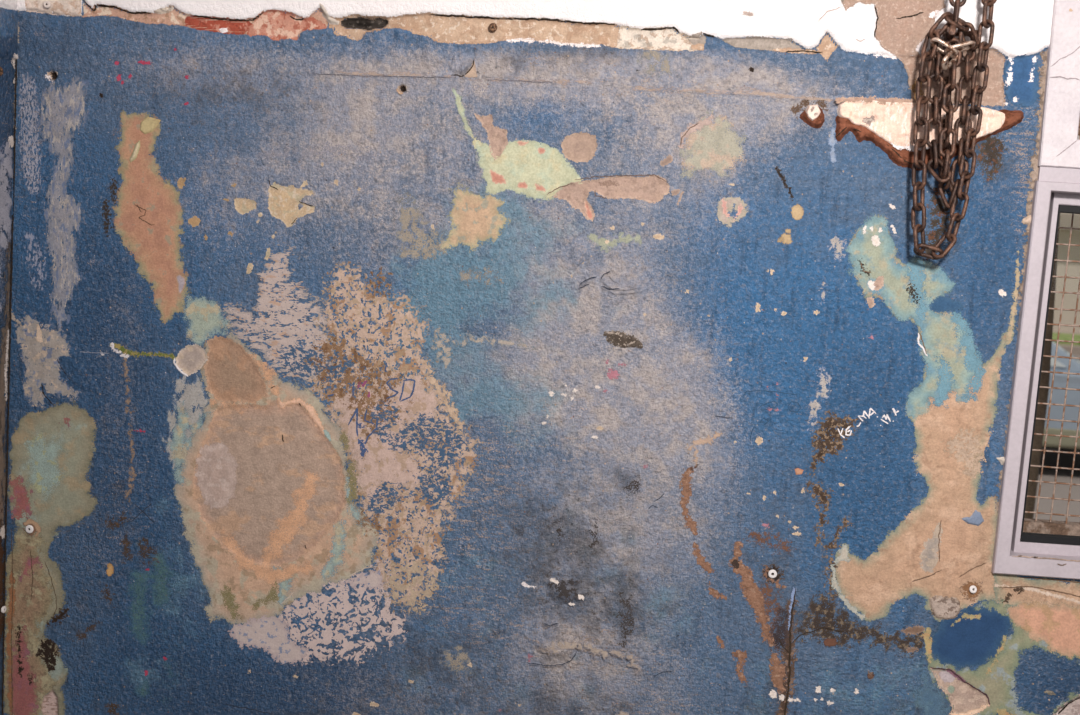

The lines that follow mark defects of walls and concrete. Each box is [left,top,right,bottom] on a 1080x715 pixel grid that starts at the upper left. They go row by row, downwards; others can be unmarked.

peeling [0,72,99,408]
peeling [100,109,379,626]
spalling [25,0,839,253]
spalling [603,330,643,349]
peeling [791,0,1080,622]
rust [679,430,797,658]
peeling [41,690,59,715]
rust [716,635,749,687]
spalling [930,667,990,715]
spalling [1044,690,1080,715]